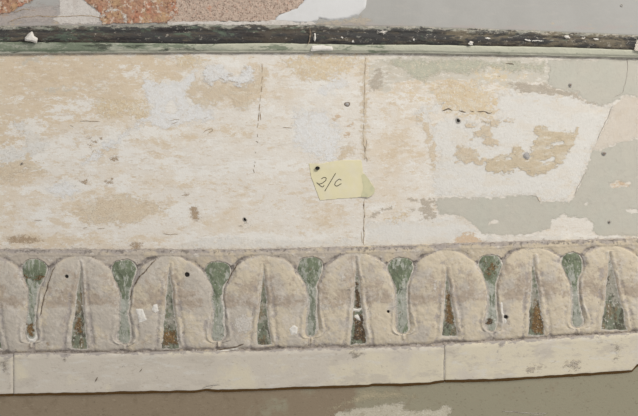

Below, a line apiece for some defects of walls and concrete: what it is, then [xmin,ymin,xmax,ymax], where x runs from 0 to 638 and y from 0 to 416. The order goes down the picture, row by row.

peeling [171,53,638,249]